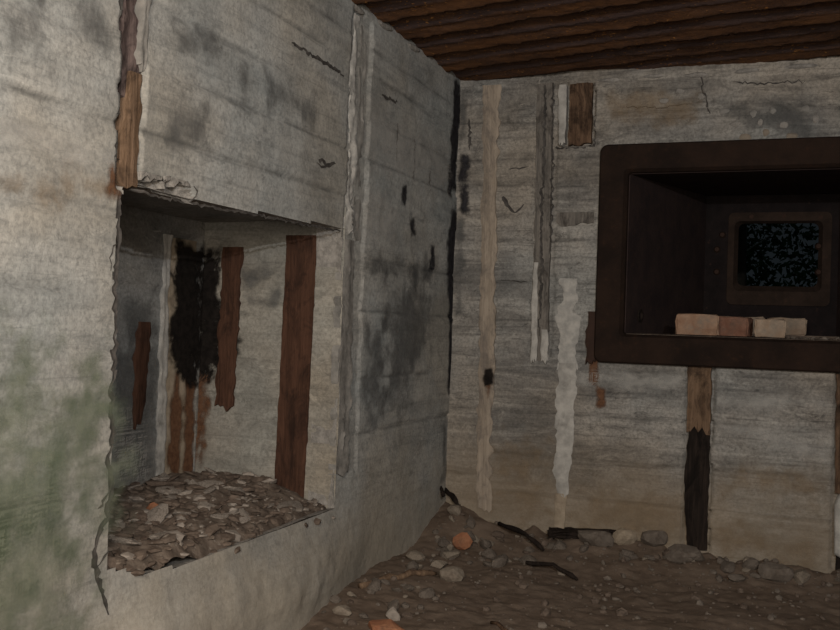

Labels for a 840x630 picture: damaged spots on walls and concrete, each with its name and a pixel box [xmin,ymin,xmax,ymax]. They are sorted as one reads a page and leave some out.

crack [292,42,344,76]
water stain [383,246,435,396]